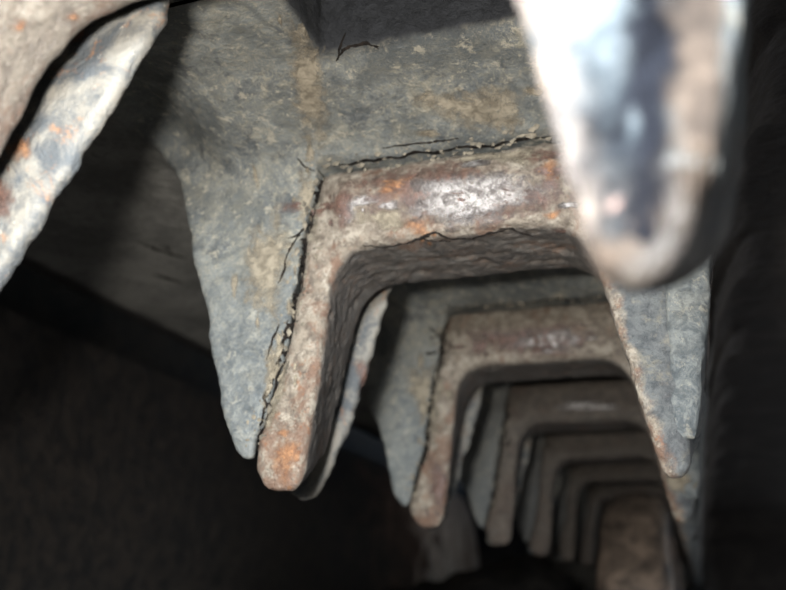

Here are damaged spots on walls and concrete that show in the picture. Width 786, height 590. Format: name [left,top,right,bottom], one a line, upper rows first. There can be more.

crack [336,33,379,61]
corrosion [531,151,564,179]
corrosion [0,180,12,216]
corrosion [285,164,485,245]
crack [245,124,555,447]
corrosion [357,361,370,387]
crack [403,292,606,497]